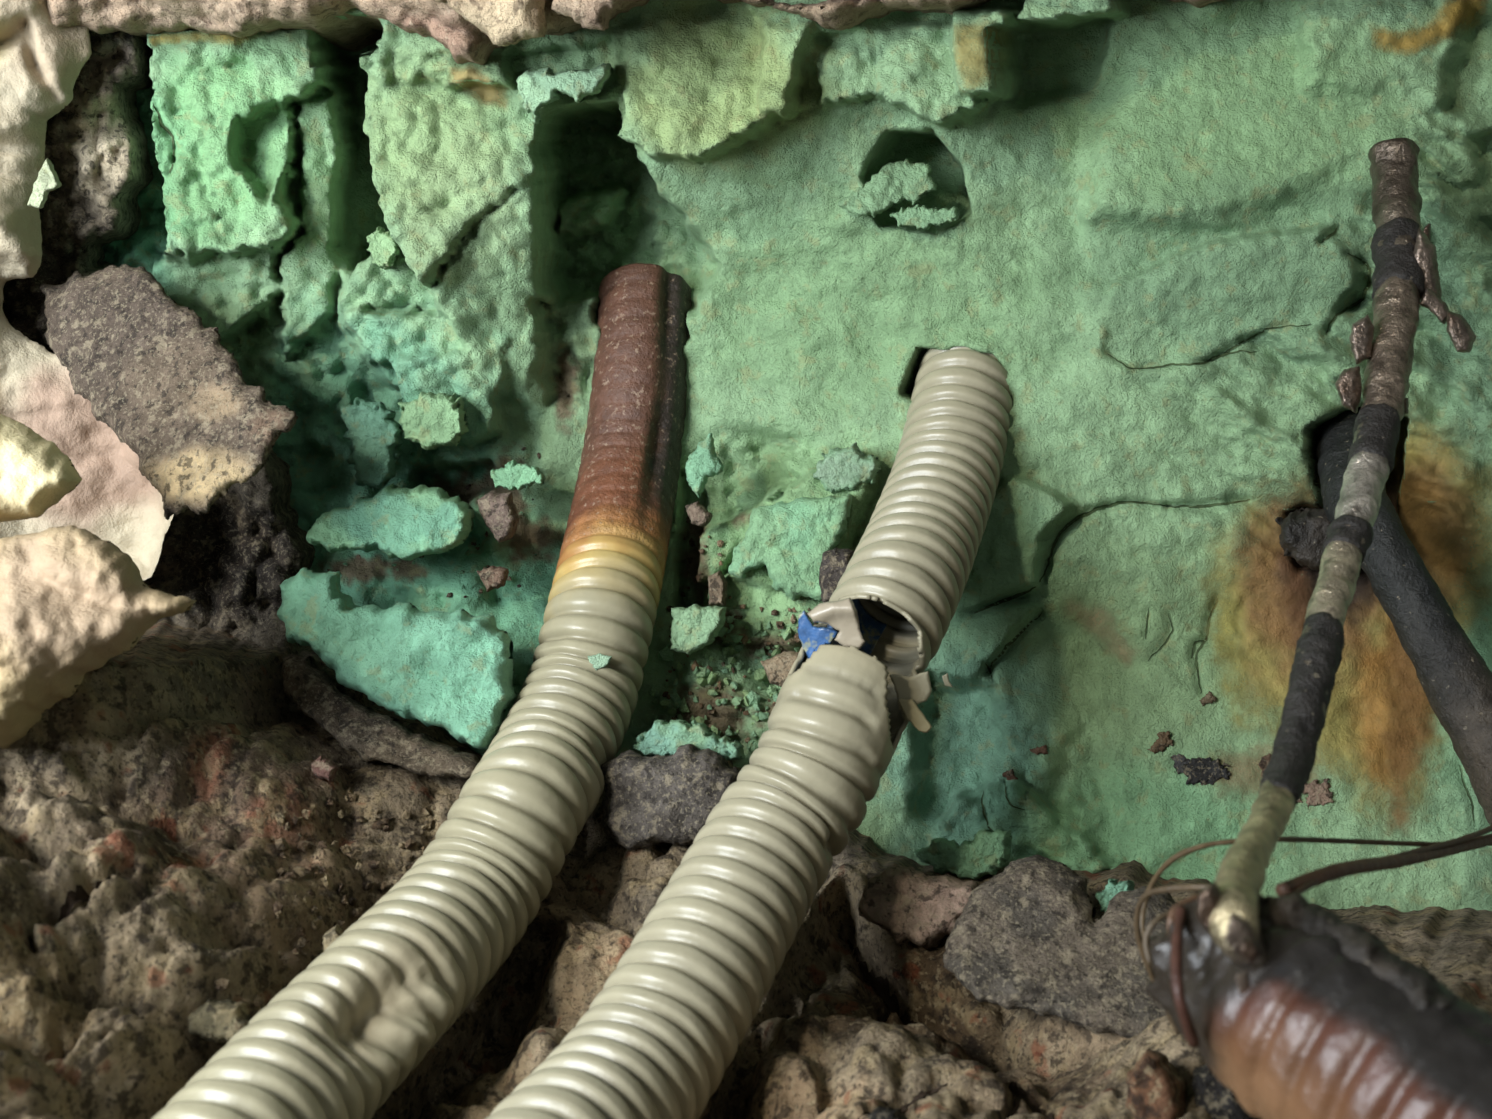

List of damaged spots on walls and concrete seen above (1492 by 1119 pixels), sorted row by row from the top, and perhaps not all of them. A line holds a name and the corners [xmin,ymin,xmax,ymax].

peeling [366,226,402,270]
peeling [838,159,959,230]
peeling [39,264,298,520]
rust [1215,465,1324,725]
rust [1317,567,1432,825]
rust [1385,421,1492,626]